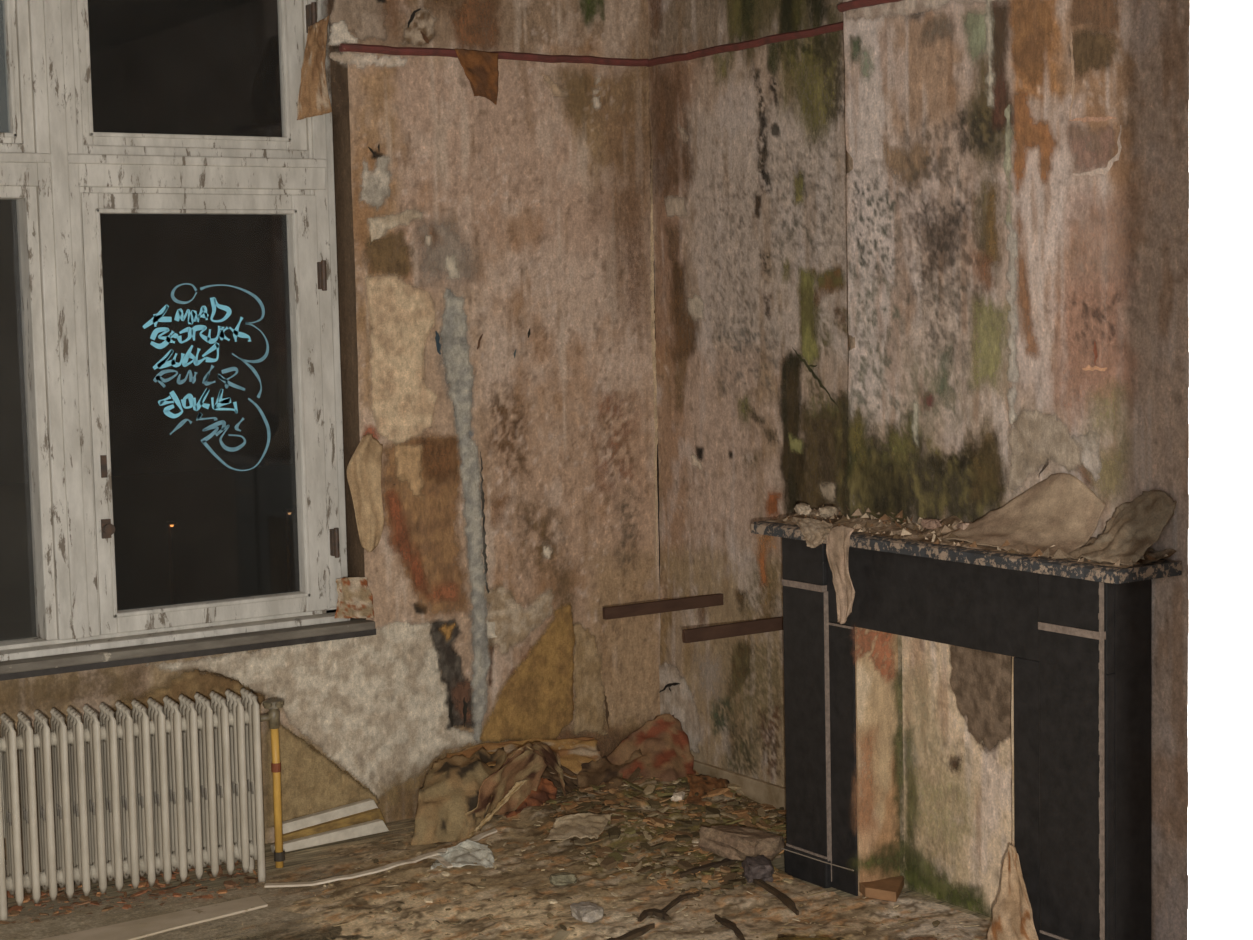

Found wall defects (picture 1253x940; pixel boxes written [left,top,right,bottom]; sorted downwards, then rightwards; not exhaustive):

damp [581,0,604,23]
flaking render [844,0,1005,21]
flaking render [1068,0,1122,177]
peeling [369,209,423,242]
damp [739,0,1052,524]
flaking render [147,289,553,799]
damp [853,657,992,918]